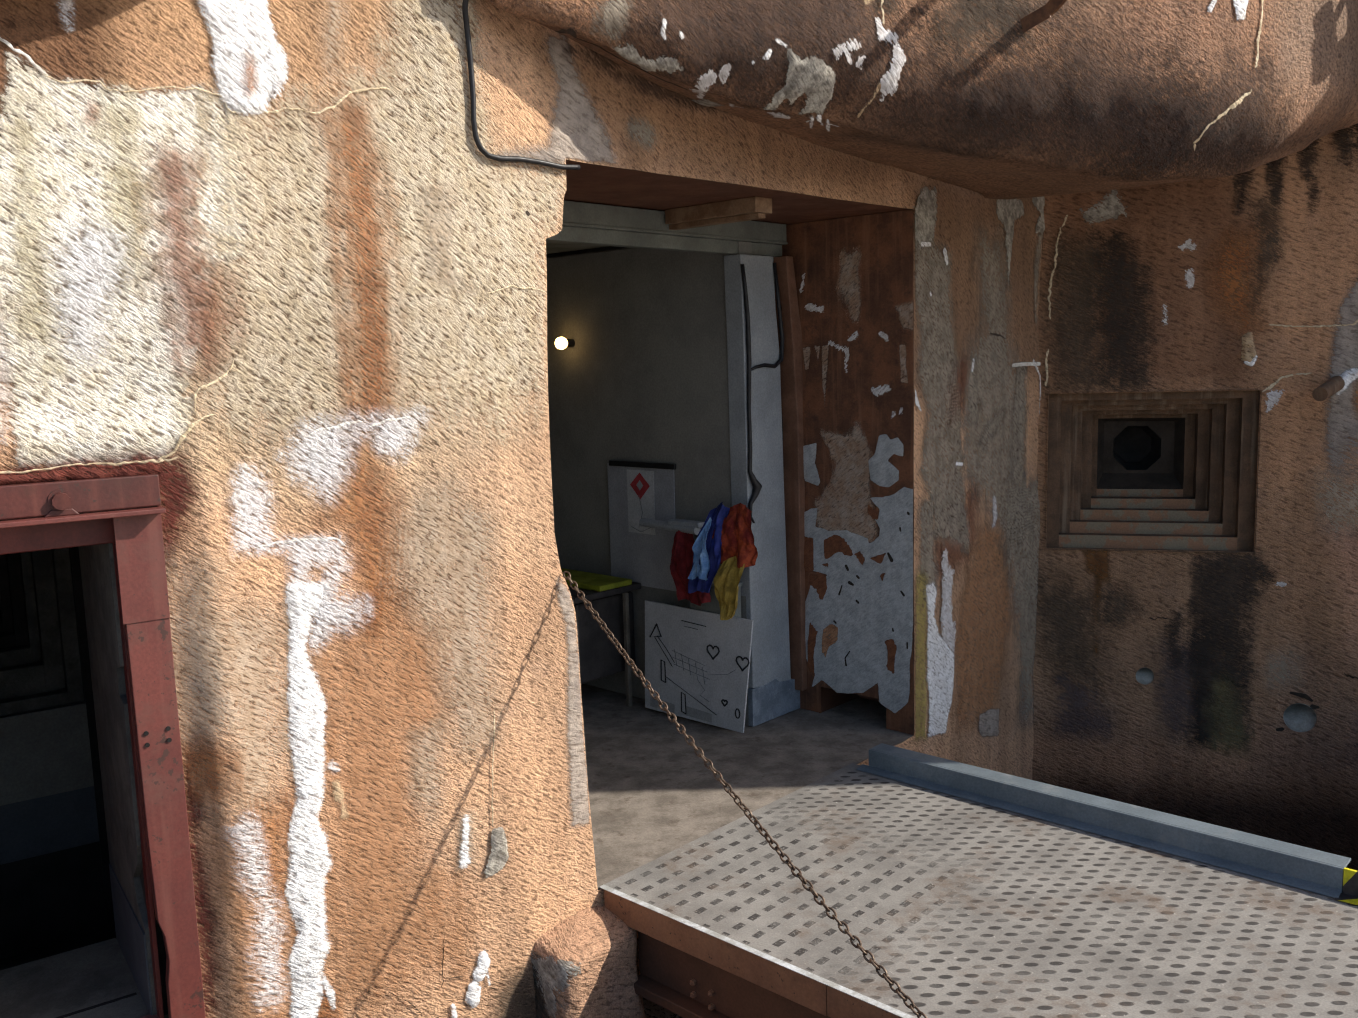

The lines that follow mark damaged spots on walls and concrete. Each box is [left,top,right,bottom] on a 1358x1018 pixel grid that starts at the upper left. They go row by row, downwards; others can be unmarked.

rust [315,103,464,1018]
leakage [0,0,1358,499]
peeling [799,273,824,313]
peeling [803,251,861,401]
peeling [803,422,913,713]
peeling [871,331,908,397]
peeling [896,303,913,330]
leakage [915,196,1158,742]
leakage [1157,551,1287,751]
rust [216,796,297,1018]